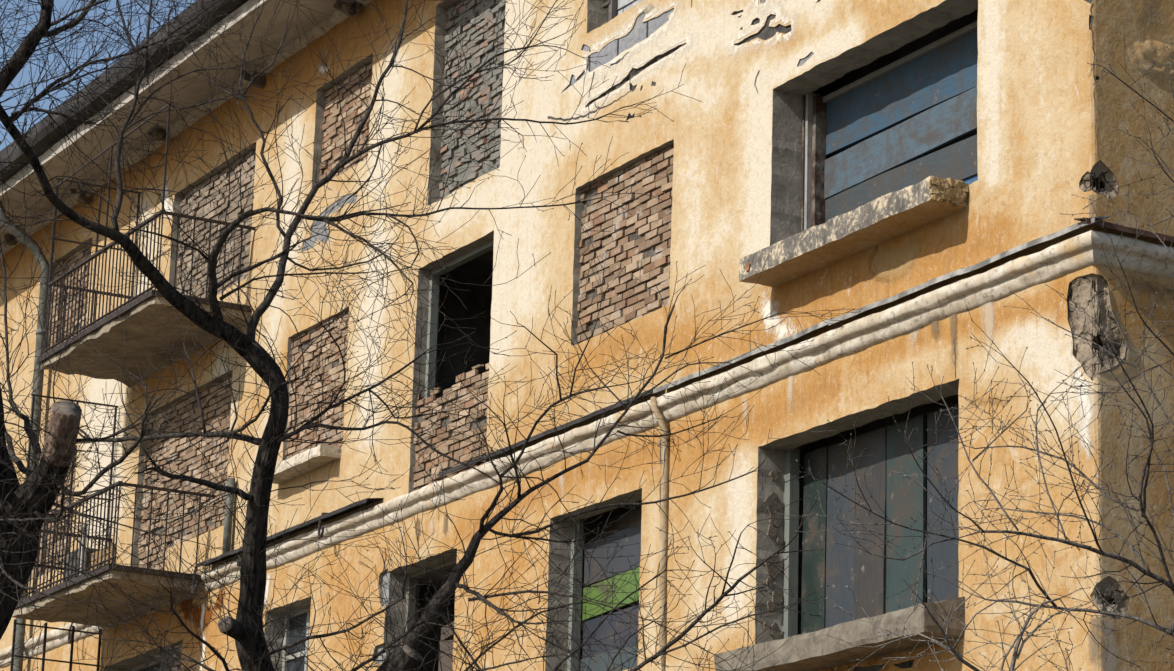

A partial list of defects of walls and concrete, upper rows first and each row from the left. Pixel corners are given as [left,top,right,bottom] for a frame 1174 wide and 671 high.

flaking render [567,0,679,89]
flaking render [728,0,796,56]
spalling [1079,161,1119,200]
spalling [1067,274,1128,381]
flaking render [763,470,784,638]
spalling [1090,576,1129,620]